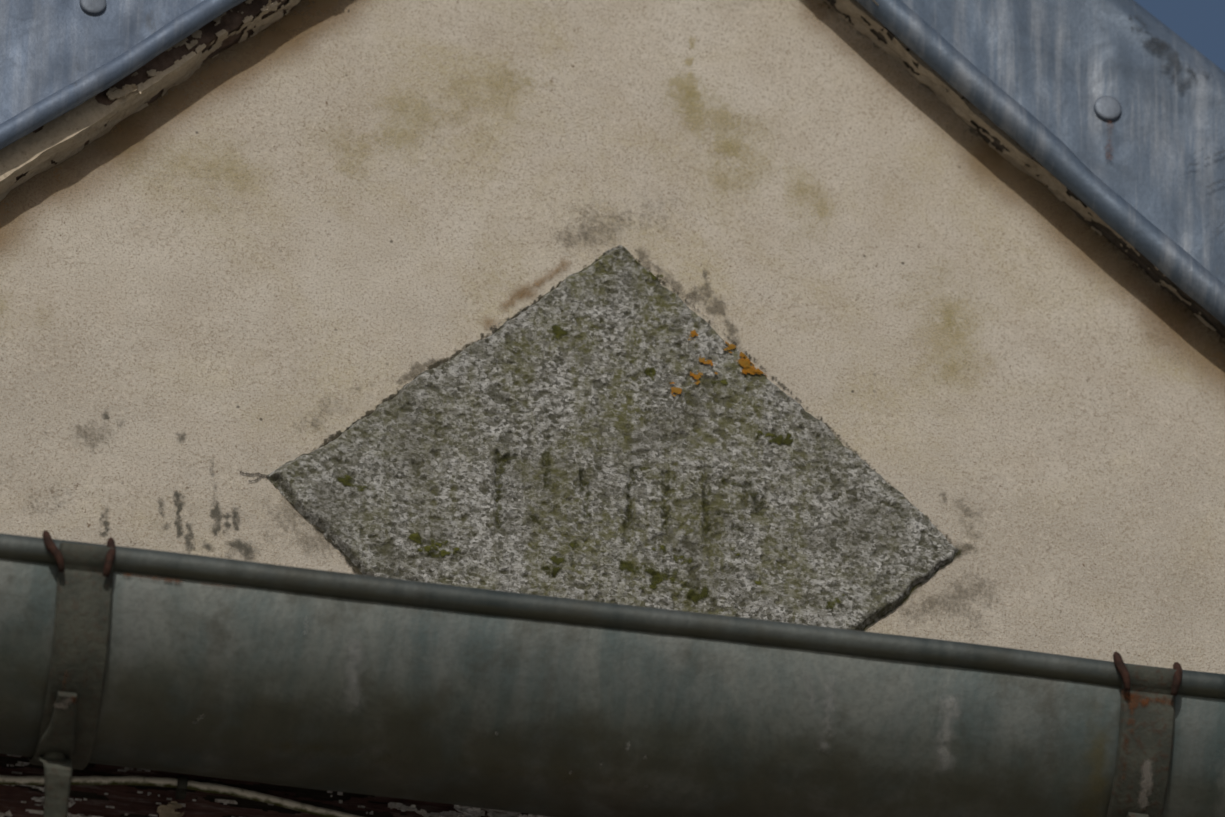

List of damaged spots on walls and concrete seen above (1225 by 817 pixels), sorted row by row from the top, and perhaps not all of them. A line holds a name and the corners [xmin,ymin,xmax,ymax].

peeling [106,69,156,100]
damp [0,0,347,245]
damp [160,491,253,558]
peeling [67,800,101,817]
peeling [157,801,184,817]
peeling [388,802,549,817]